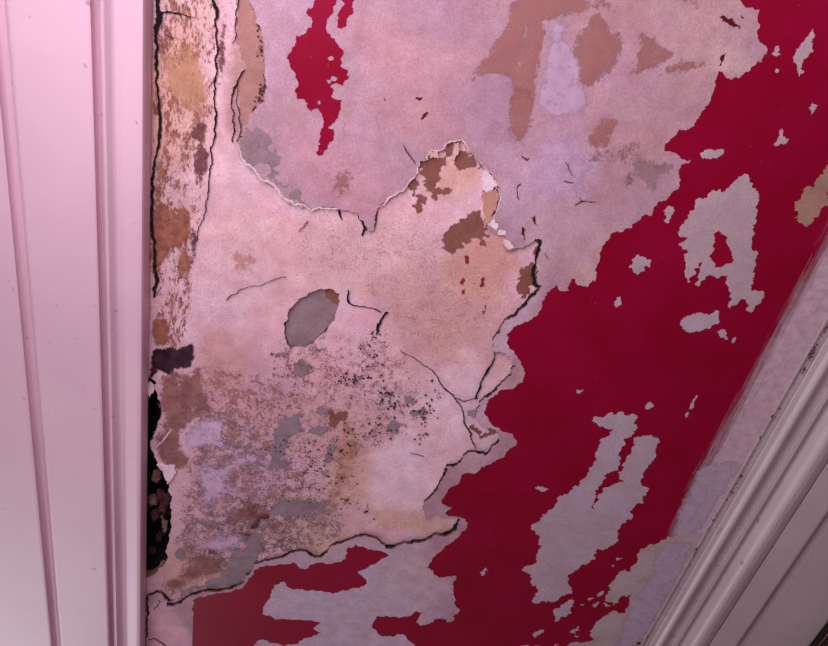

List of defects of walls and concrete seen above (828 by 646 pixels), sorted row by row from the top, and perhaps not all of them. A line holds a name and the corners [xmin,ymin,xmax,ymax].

crack [150,0,245,298]
leakage [149,331,443,596]
crack [347,289,388,335]
spalling [145,0,781,646]
crack [400,239,548,502]
peeling [794,165,828,227]